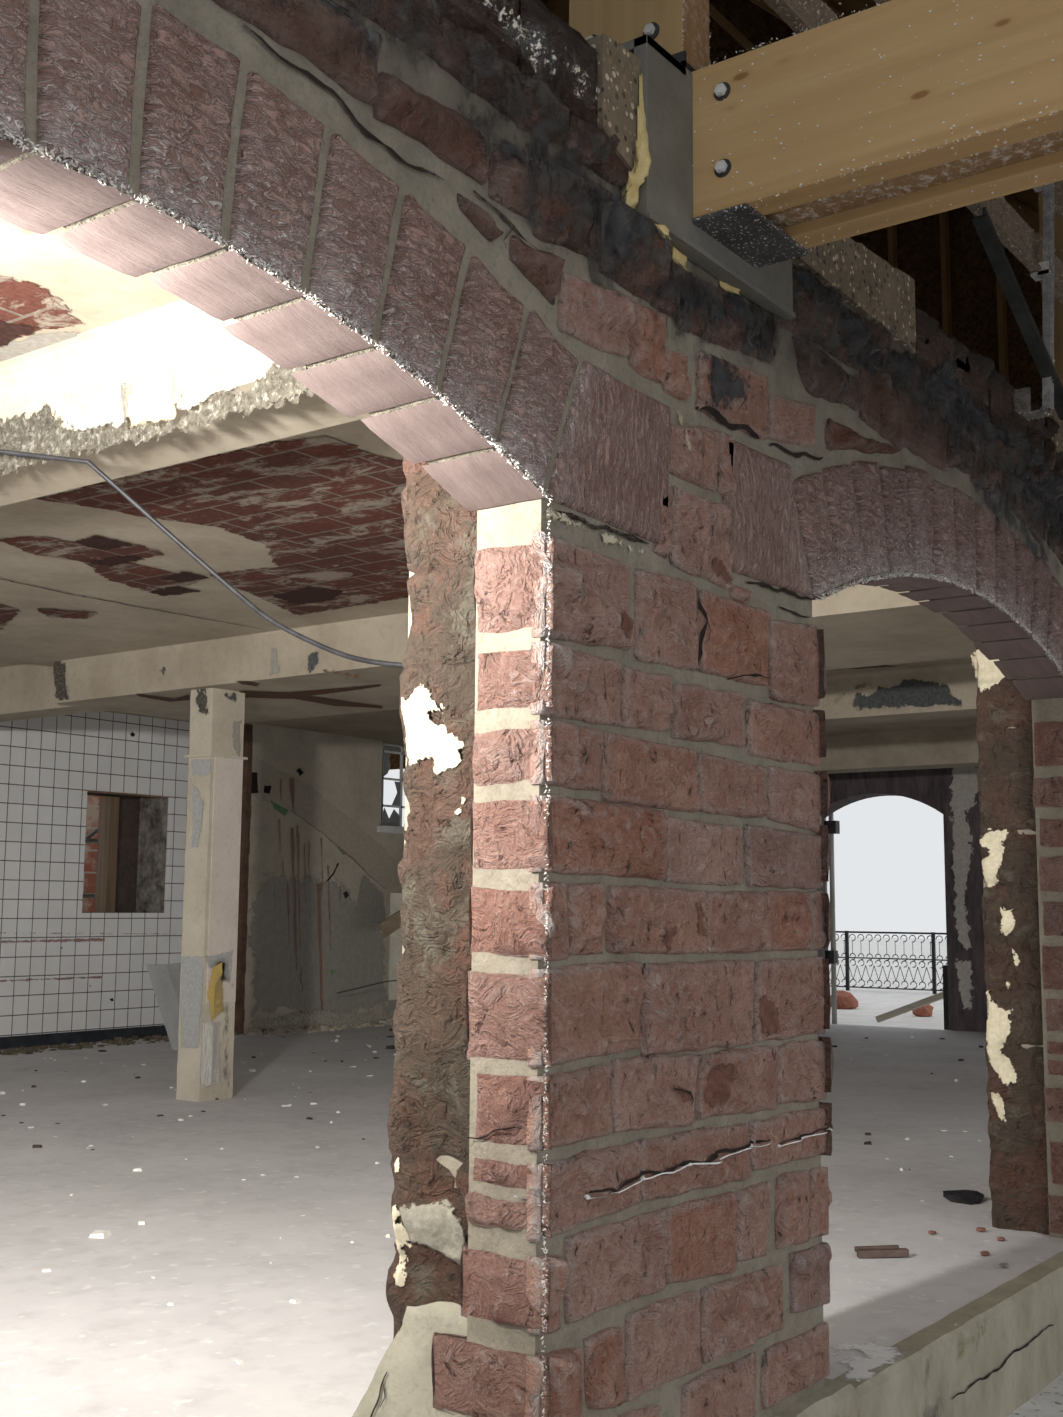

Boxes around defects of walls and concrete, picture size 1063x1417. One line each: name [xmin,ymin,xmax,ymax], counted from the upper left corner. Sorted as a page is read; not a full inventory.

crack [243,24,554,254]
flaking render [0,276,82,347]
flaking render [0,436,409,615]
flaking render [0,604,98,629]
spalling [137,694,190,702]
spalling [237,648,383,708]
flaking render [401,684,464,774]
crack [697,589,768,680]
flaking render [971,649,1005,692]
flaking render [949,767,1020,1122]
crack [584,1127,832,1200]
crack [952,1324,1054,1400]